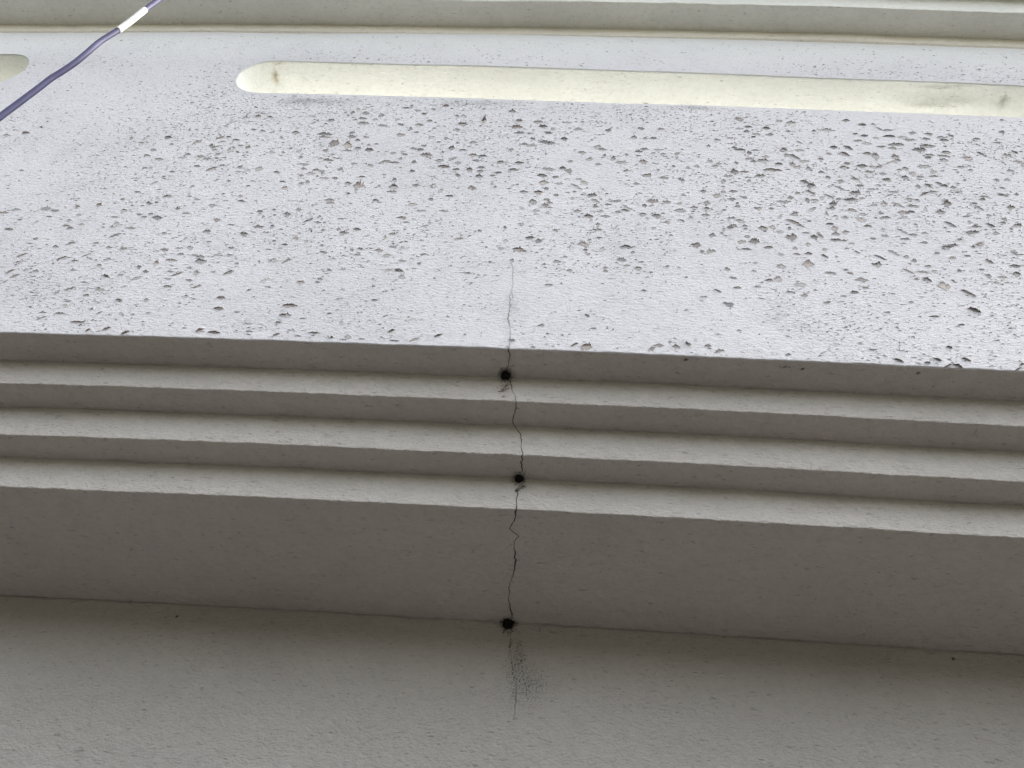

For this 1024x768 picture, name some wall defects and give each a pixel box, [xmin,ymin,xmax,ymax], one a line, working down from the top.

crack [502,263,526,717]